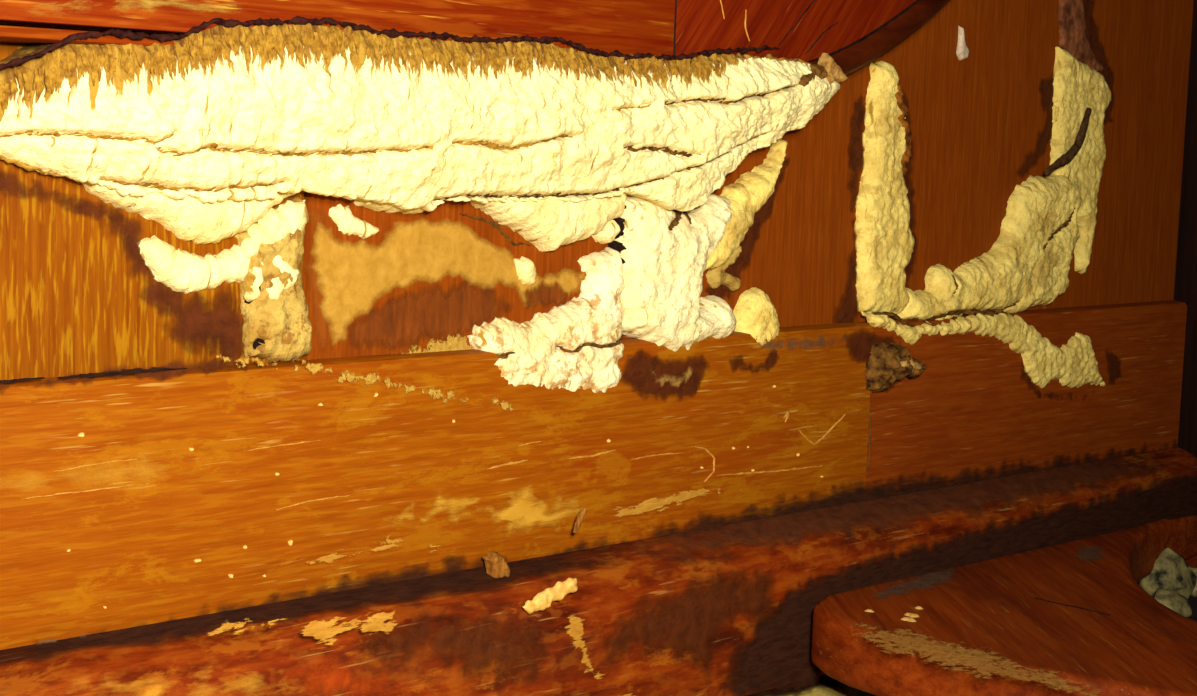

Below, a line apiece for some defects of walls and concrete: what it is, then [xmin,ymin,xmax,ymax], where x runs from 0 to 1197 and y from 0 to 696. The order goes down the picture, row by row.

leakage [707,159,789,298]
leakage [849,98,865,227]
leakage [904,141,917,279]
leakage [1019,76,1054,176]
leakage [61,198,247,380]
leakage [351,280,509,348]
leakage [525,283,568,307]
leakage [835,250,893,362]
leakage [623,351,706,399]
peeling [208,618,286,636]
peeling [300,611,397,645]
peeling [565,616,605,679]